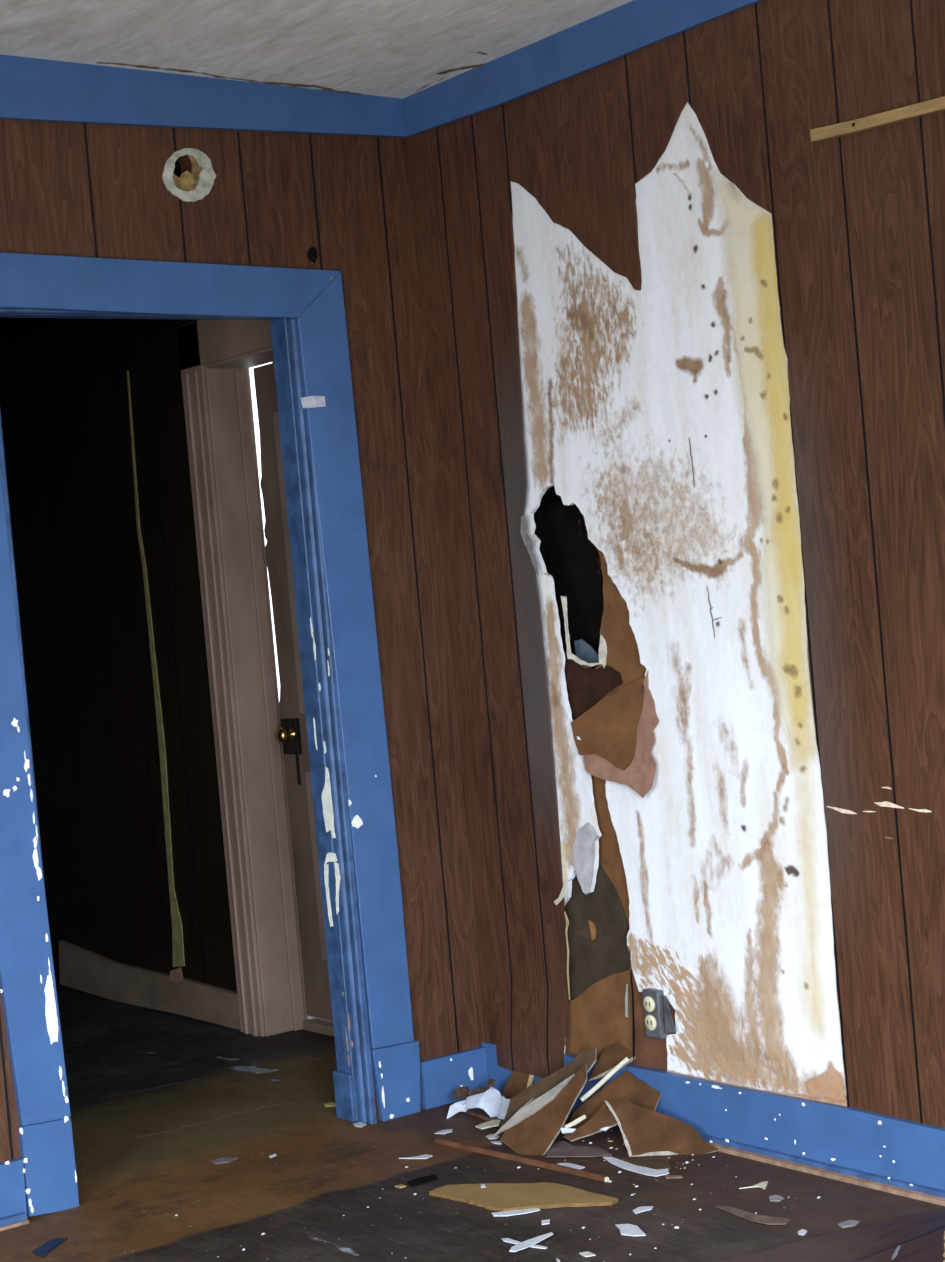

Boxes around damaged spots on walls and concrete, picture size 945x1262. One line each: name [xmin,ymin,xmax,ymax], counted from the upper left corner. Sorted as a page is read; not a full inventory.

damp [521,246,631,484]
peeling [310,617,330,691]
damp [609,141,815,1096]
peeling [3,752,42,881]
peeling [313,718,341,927]
peeling [348,800,363,829]
spalling [520,486,676,1071]